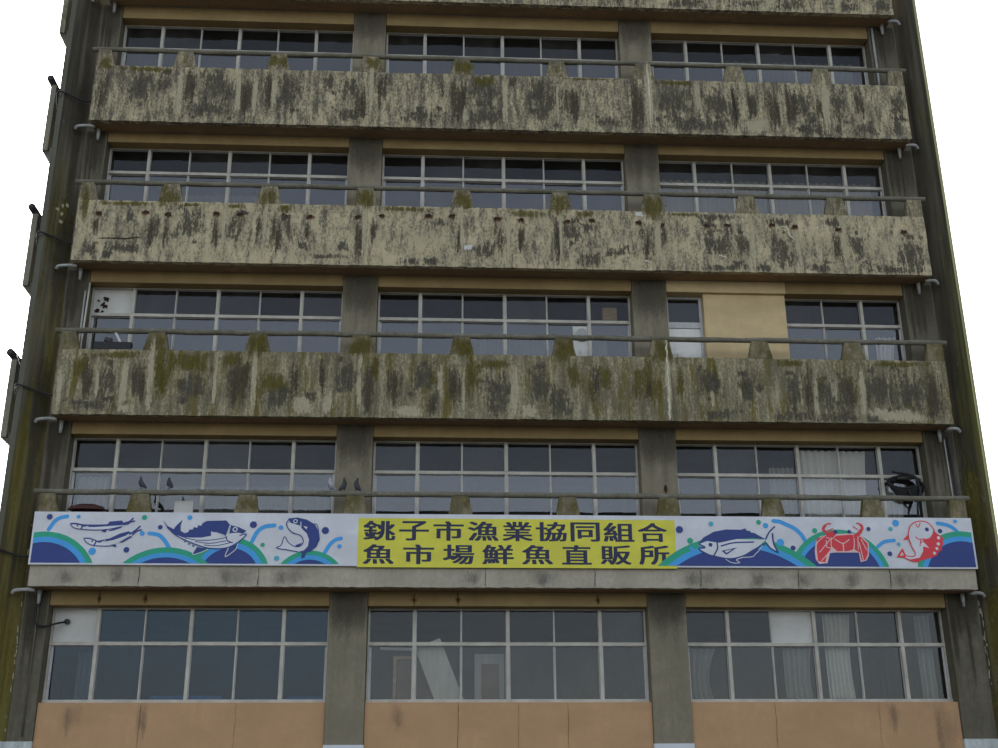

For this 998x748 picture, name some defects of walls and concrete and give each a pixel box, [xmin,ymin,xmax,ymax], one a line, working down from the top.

water stain [234,69,278,120]
water stain [354,66,387,124]
water stain [556,84,580,124]
water stain [625,68,654,132]
water stain [731,87,798,135]
water stain [256,189,283,259]
water stain [117,336,156,414]
water stain [211,350,258,414]
water stain [289,358,333,415]
water stain [386,364,465,417]
water stain [509,365,540,418]
water stain [15,366,68,498]